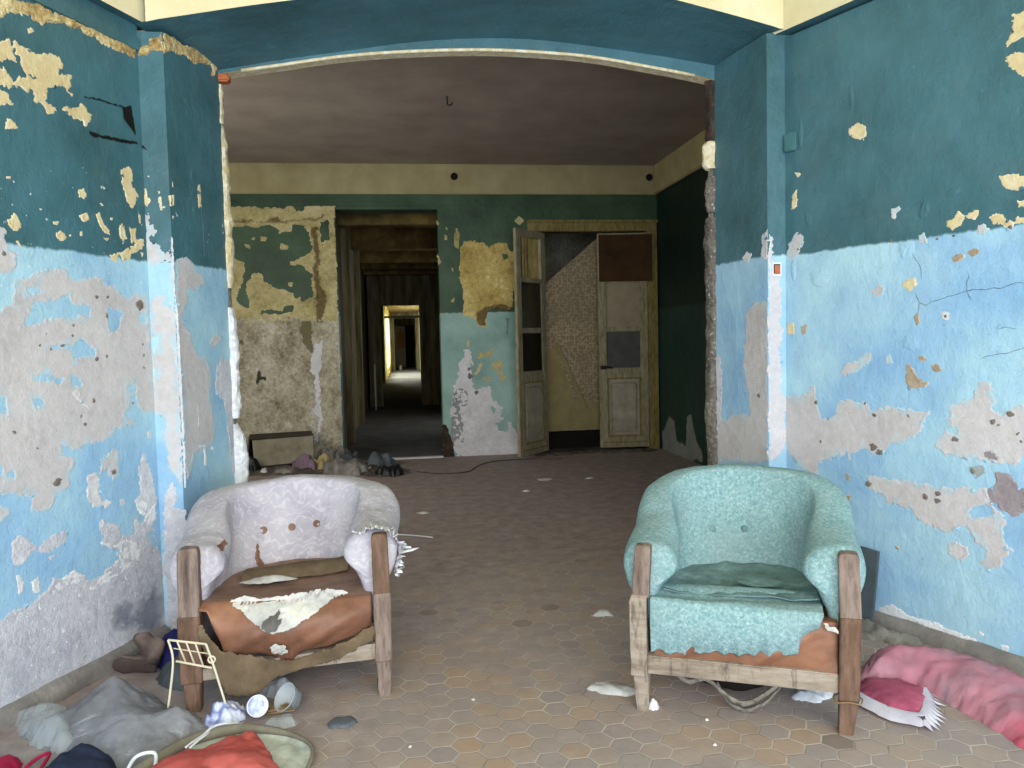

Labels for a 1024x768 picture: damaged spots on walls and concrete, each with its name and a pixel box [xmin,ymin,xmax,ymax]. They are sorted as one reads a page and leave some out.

peeling [1005,11,1024,77]
peeling [946,174,1024,237]
peeling [436,221,514,334]
peeling [702,80,930,475]
crack [912,253,1021,321]
peeling [0,0,343,708]
peeling [442,340,518,457]
flaking render [905,356,943,390]
peeling [865,380,1024,572]